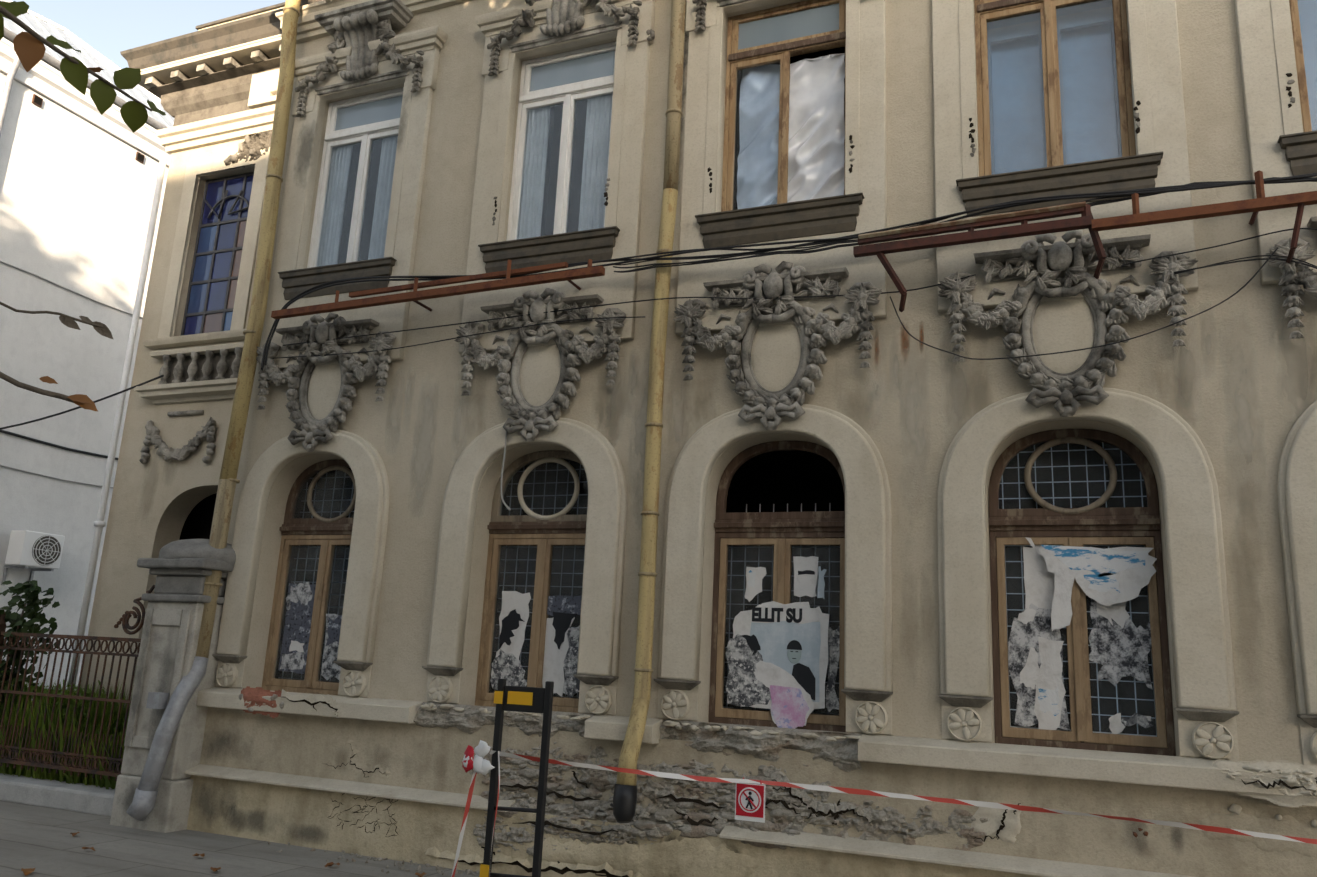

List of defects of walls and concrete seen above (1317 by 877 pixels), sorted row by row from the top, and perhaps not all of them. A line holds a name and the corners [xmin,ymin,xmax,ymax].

flaking render [239,686,284,718]
spalling [662,720,783,736]
spalling [802,733,861,741]
crack [281,689,398,837]
flaking render [467,741,988,863]
flaking render [1198,759,1317,857]
crack [425,846,645,877]